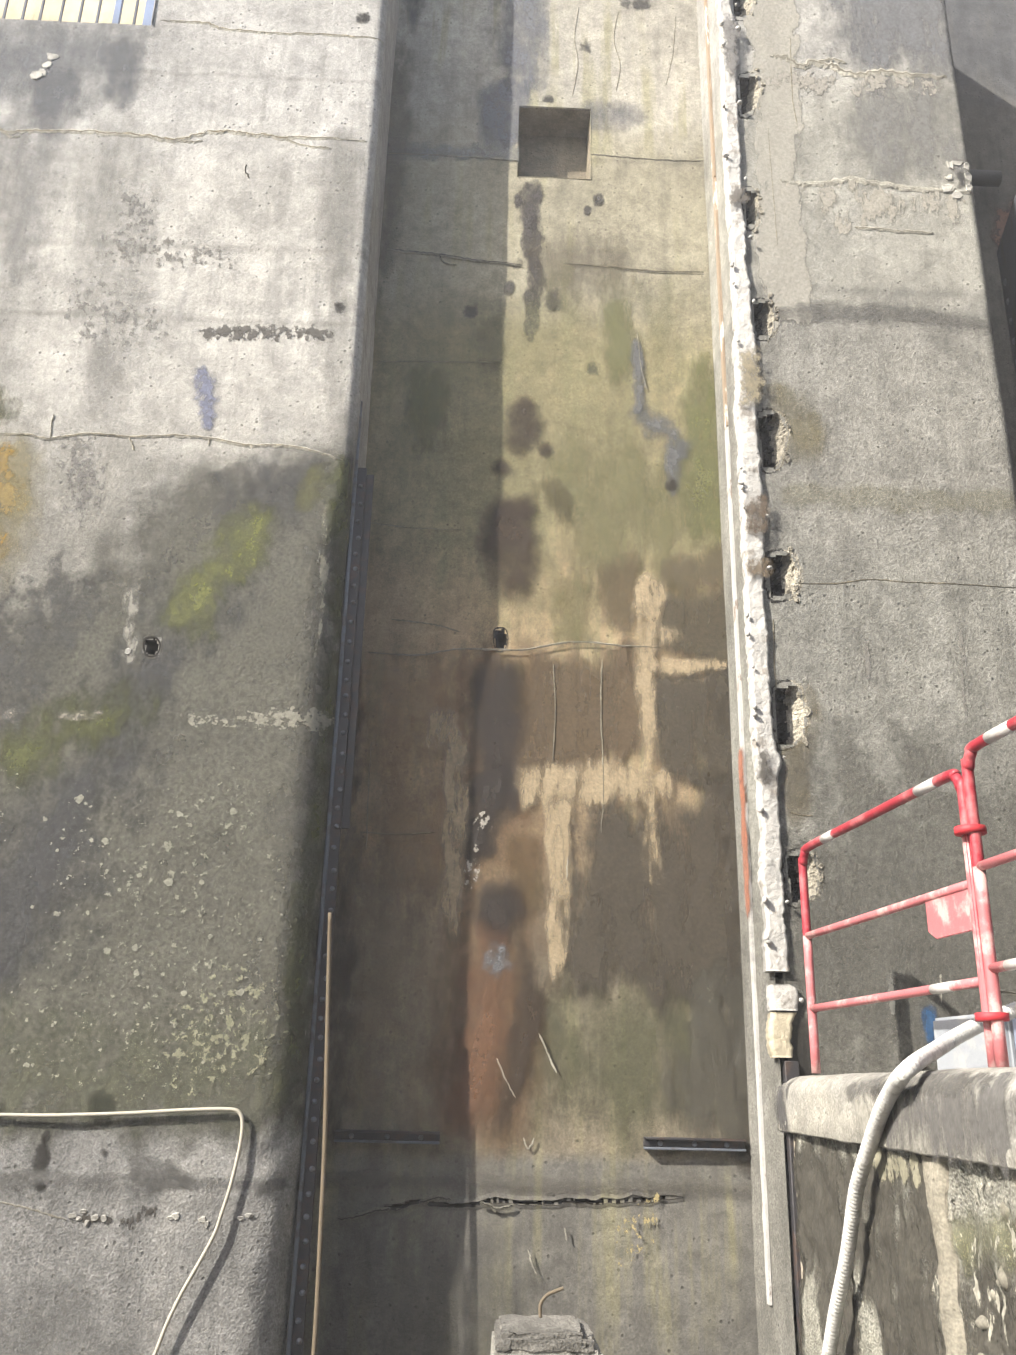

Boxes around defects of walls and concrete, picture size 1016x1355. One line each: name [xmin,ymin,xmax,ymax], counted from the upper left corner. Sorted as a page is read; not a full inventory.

spalling [722,68,765,119]
crack [0,127,519,179]
water stain [504,182,562,341]
spalling [736,292,779,343]
crack [0,415,343,461]
spalling [756,407,792,474]
spalling [752,679,811,758]
water stain [0,441,355,1191]
water stain [427,545,751,1169]
spalling [781,839,824,911]
crack [337,1190,683,1221]
water stain [956,1162,1016,1355]